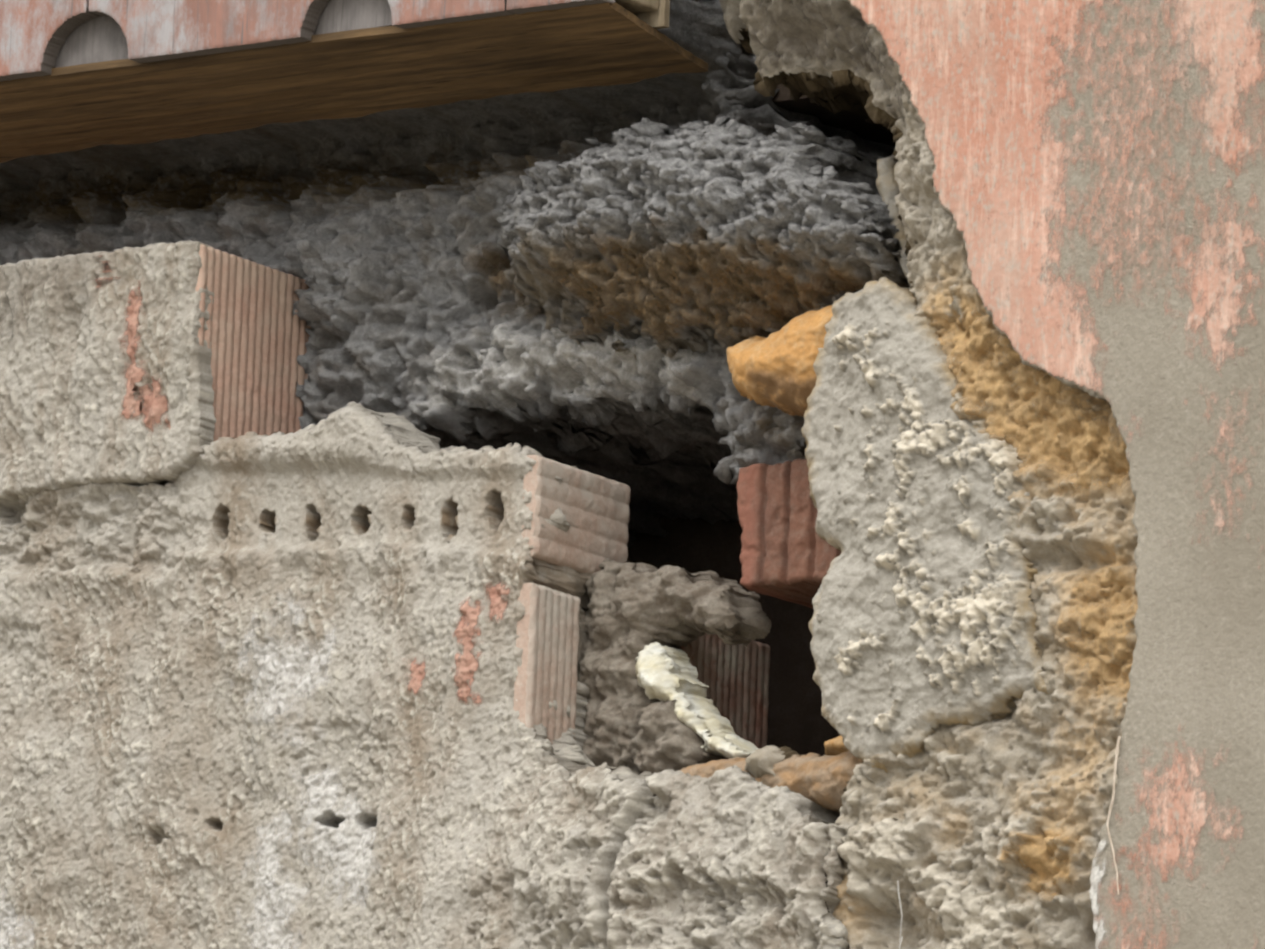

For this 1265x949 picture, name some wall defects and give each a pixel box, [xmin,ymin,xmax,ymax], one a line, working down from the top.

spalling [739,0,1265,949]